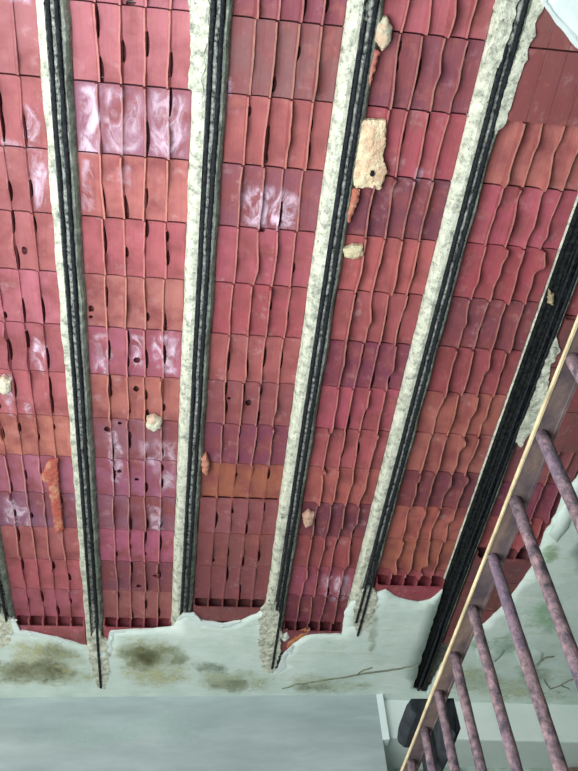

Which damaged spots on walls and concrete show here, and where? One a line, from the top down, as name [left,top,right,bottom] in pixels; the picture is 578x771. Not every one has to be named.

water stain [80,87,134,177]
water stain [152,96,183,154]
water stain [246,189,295,226]
spalling [37,0,125,689]
spalling [176,0,241,628]
spalling [257,0,380,673]
spalling [353,0,578,691]
spalling [0,568,70,650]
water stain [0,644,73,684]
water stain [120,640,184,683]
water stain [197,664,246,691]